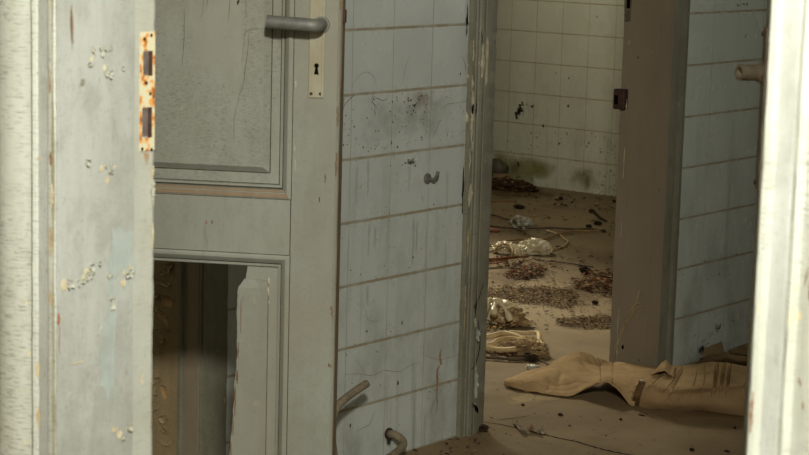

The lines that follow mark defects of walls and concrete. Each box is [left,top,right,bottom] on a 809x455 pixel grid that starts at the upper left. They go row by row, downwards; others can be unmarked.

peeling [152,262,174,355]
crack [471,286,483,398]
peeling [152,377,172,446]